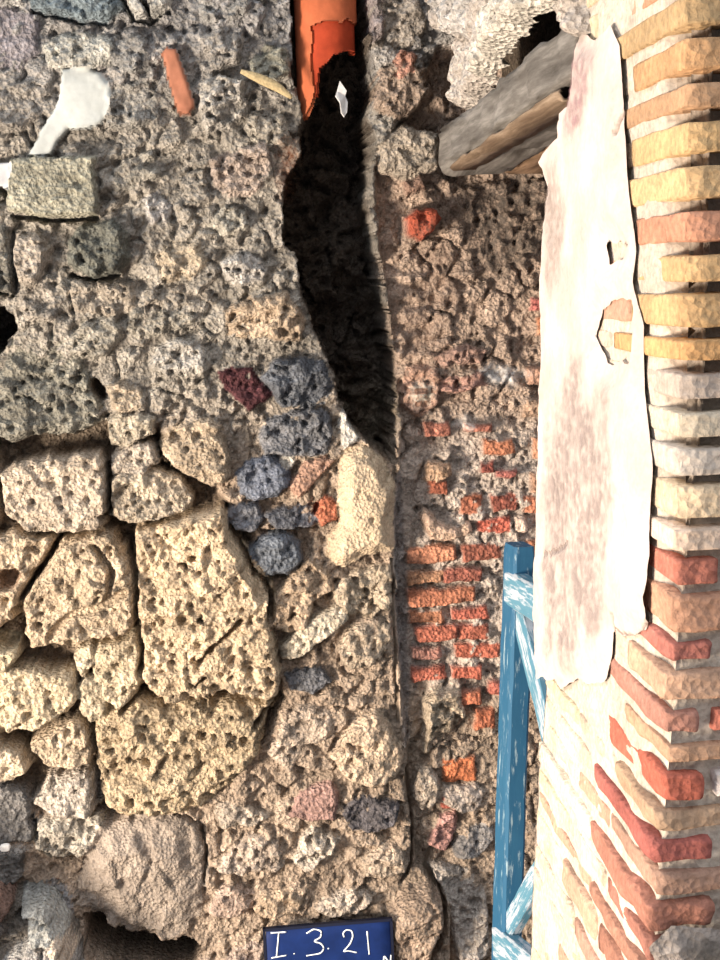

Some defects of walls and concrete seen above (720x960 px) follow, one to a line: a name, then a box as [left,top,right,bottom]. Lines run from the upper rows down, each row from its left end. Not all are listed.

flaking render [532,25,653,689]